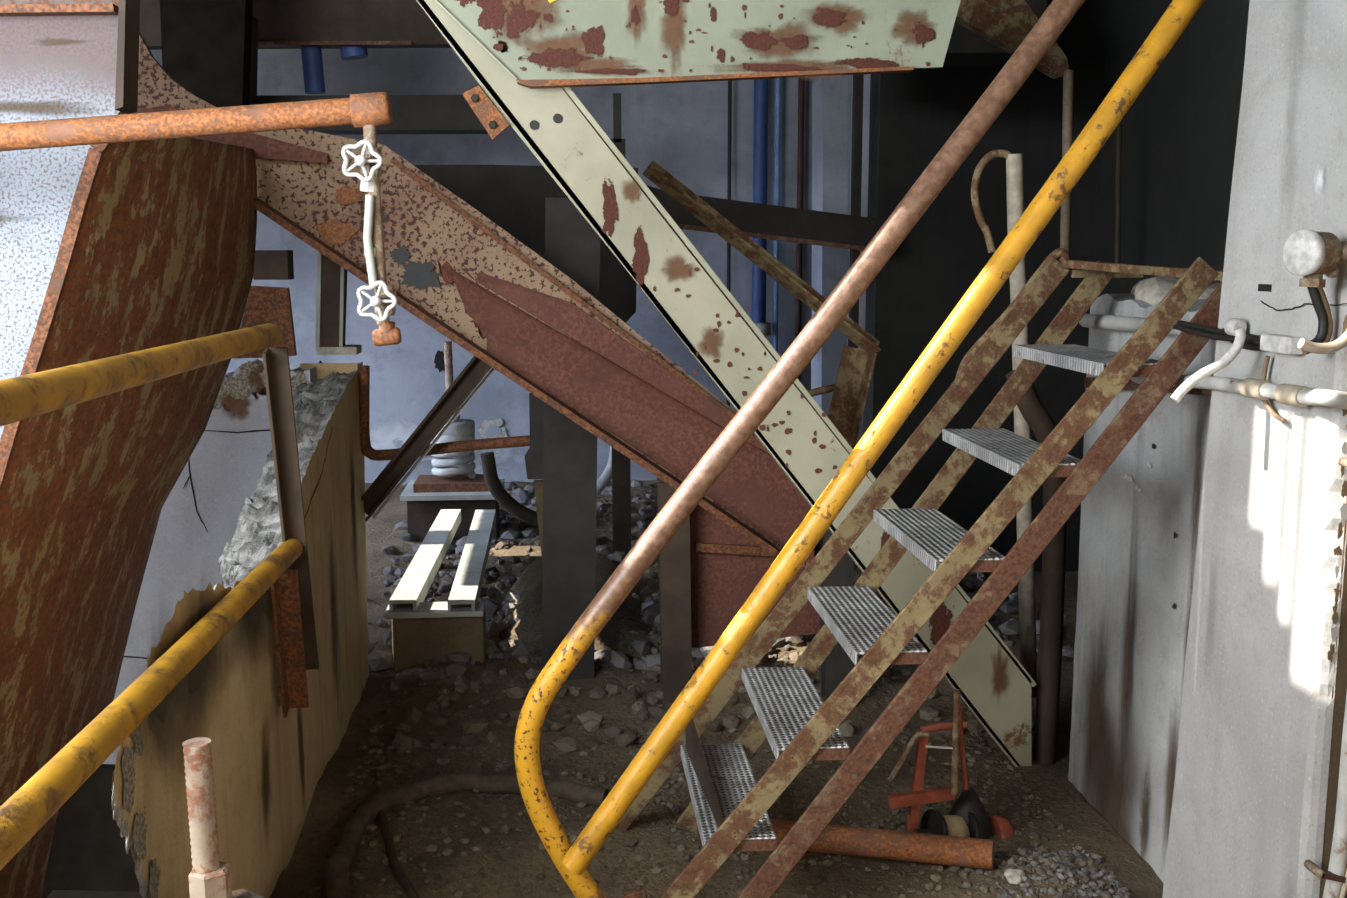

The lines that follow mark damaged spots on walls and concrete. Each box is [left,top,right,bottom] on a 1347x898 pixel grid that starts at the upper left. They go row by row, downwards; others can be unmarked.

corrosion [457,0,898,75]
corrosion [894,22,935,66]
corrosion [602,178,639,237]
corrosion [631,225,656,291]
corrosion [666,257,699,298]
corrosion [681,305,766,396]
corrosion [759,411,792,434]
corrosion [1168,387,1212,396]
corrosion [1191,428,1200,556]
corrosion [929,602,954,650]
corrosion [1084,554,1147,858]
corrosion [1165,732,1175,837]